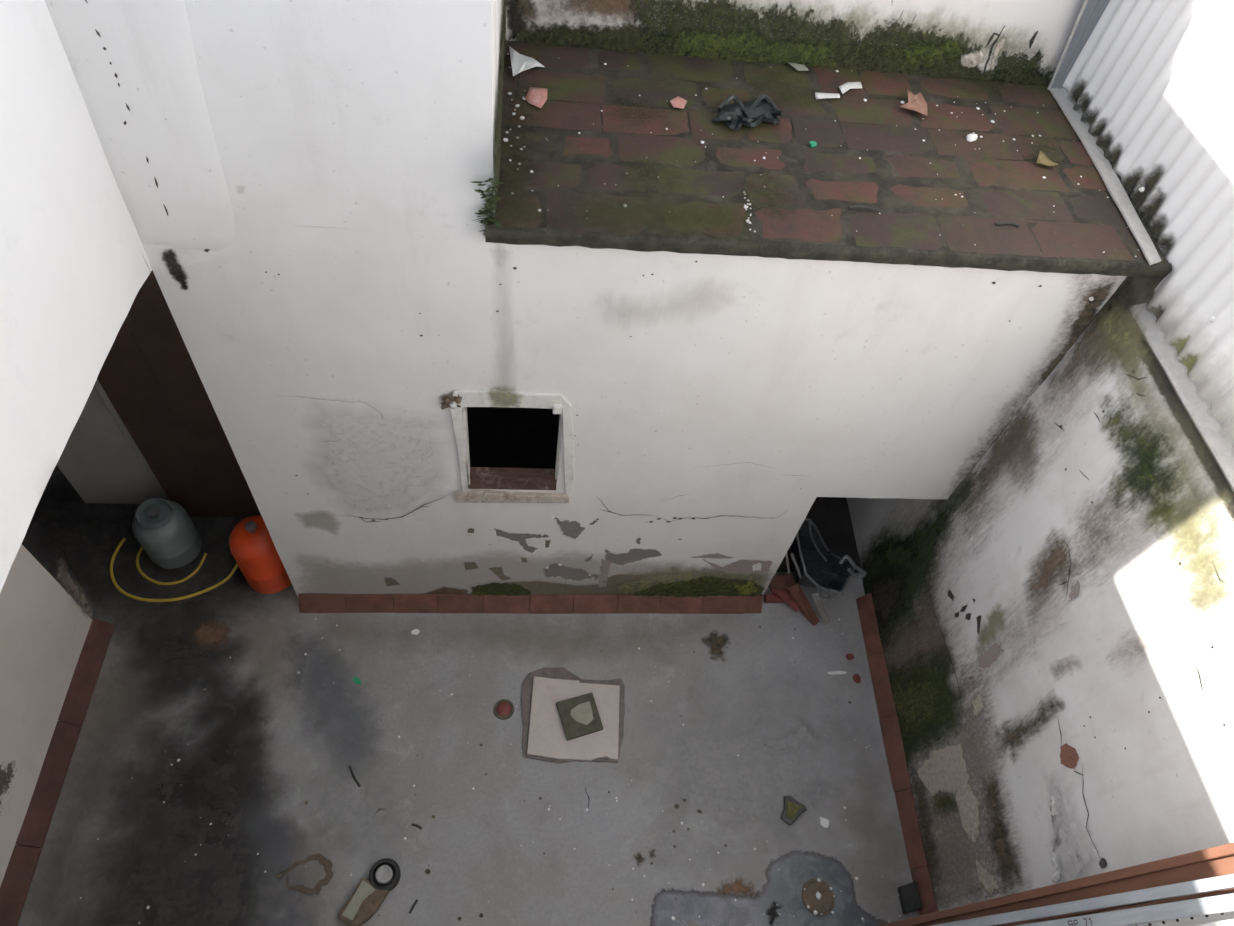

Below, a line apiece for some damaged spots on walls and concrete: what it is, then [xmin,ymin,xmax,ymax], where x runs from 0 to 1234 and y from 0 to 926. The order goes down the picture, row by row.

leakage [503,0,644,41]
leakage [955,281,1164,495]
crack [354,494,450,522]
peeling [465,562,511,580]
peeling [489,515,599,562]
peeling [543,538,662,587]
leakage [1027,538,1076,605]
leakage [25,480,302,926]
leakage [998,697,1062,757]
crack [1050,719,1107,868]